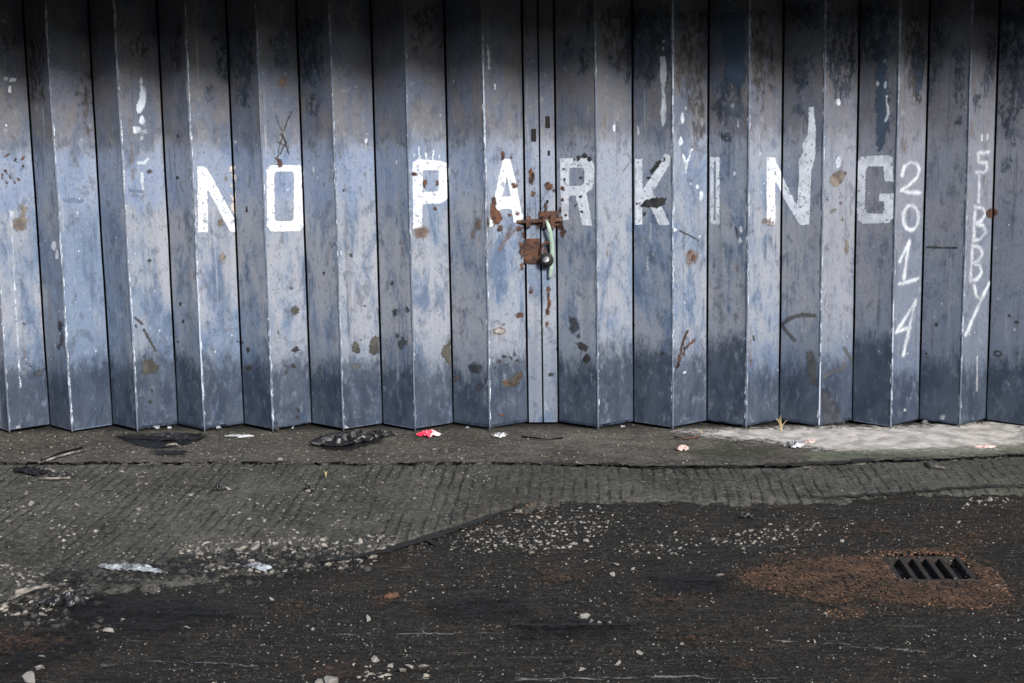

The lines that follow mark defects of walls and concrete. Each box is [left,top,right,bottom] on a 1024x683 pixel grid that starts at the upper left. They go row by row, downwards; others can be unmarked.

corrosion [472,167,567,271]
peeling [636,197,667,216]
peeling [141,359,159,375]
water stain [0,317,527,430]
peeling [339,335,379,380]
peeling [441,340,523,390]
peeling [569,318,599,379]
water stain [558,330,1024,427]